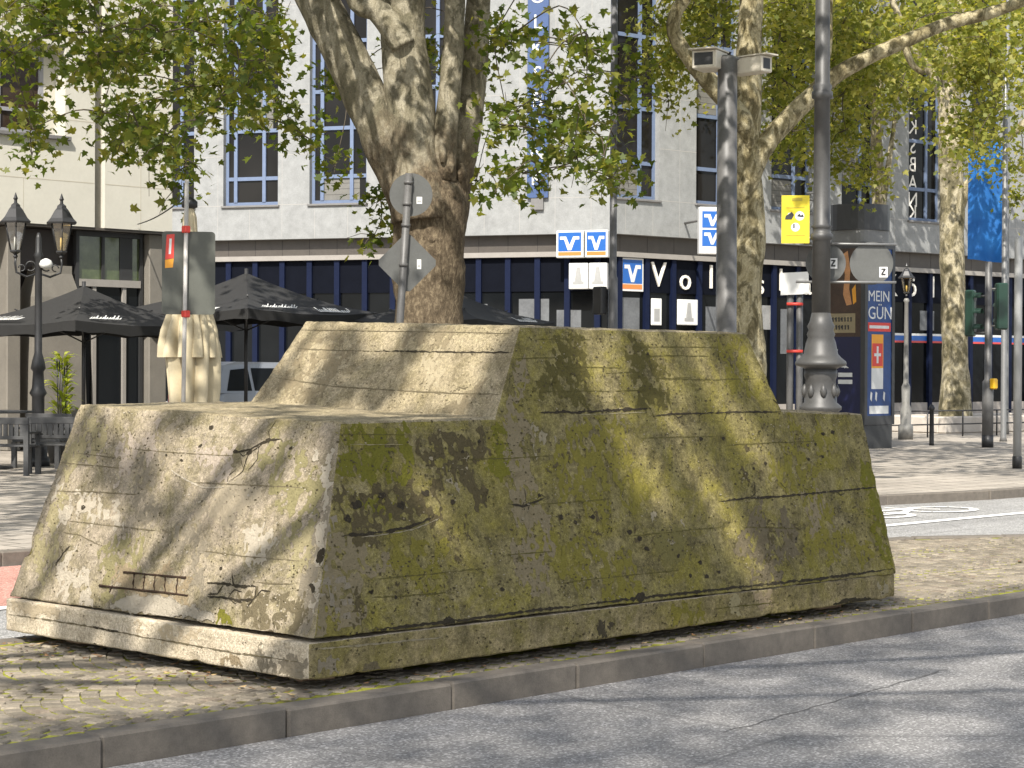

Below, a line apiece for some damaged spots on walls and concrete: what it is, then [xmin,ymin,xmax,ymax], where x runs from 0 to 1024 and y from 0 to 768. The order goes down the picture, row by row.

damp [441,377,488,414]
damp [533,332,591,414]
damp [624,331,672,417]
crack [227,422,280,482]
damp [415,426,491,513]
crack [342,516,434,537]
damp [733,484,826,589]
crack [207,575,294,607]